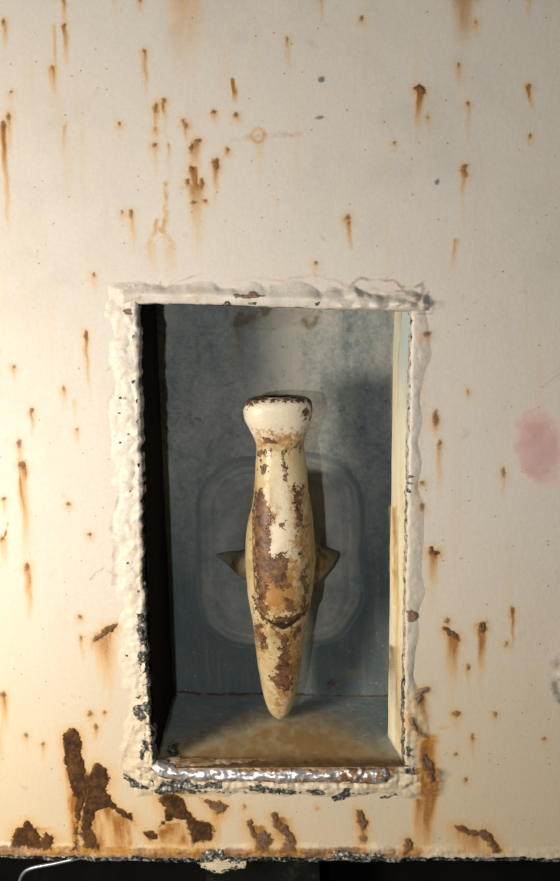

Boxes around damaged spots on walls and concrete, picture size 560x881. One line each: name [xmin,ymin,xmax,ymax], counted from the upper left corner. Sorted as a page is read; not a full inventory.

rust [185,166,206,204]
rust [93,623,118,654]
rust [442,619,459,659]
rust [416,687,428,711]
rust [168,722,408,769]
rust [11,821,53,850]
rust [62,728,132,850]
rust [143,793,215,846]
rust [204,799,228,815]
rust [247,812,296,853]
rust [409,717,439,833]
rust [454,825,500,853]